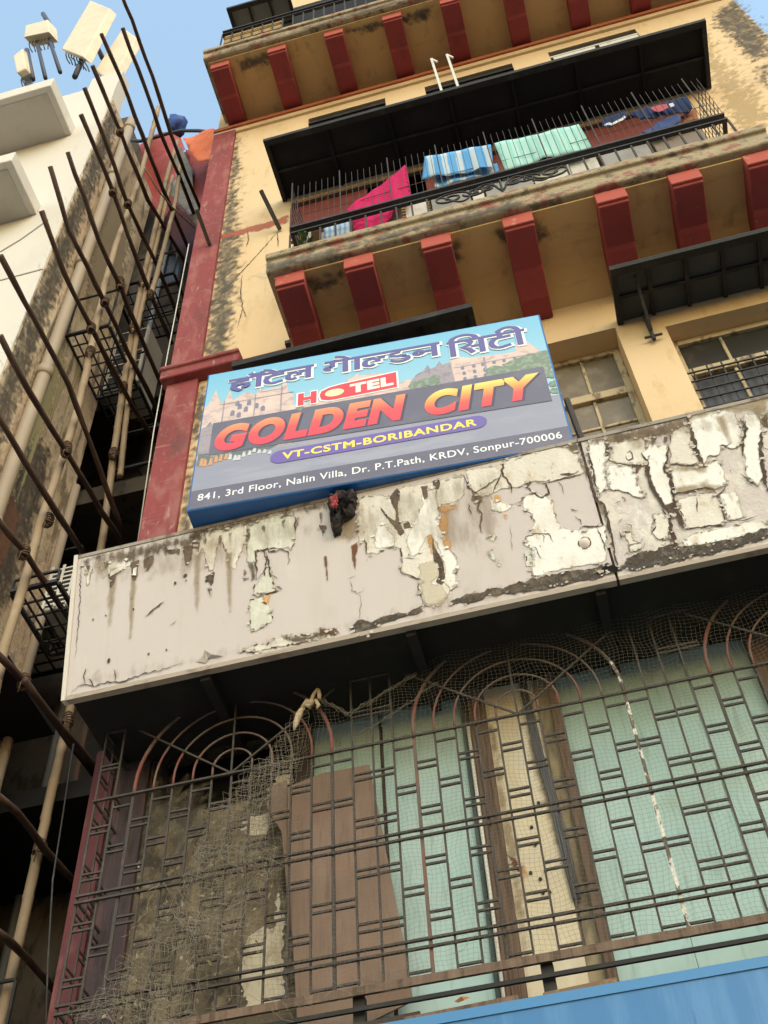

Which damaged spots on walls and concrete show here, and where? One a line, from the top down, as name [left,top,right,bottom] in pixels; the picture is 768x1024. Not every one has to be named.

leakage [240,53,269,70]
leakage [708,1,768,129]
leakage [0,111,117,443]
leakage [86,193,135,322]
leakage [204,142,242,354]
crack [223,231,279,325]
leakage [267,201,524,268]
leakage [192,386,205,450]
leakage [84,465,298,607]
peeling [108,513,337,654]
peeling [350,410,768,637]
peeling [197,650,220,663]